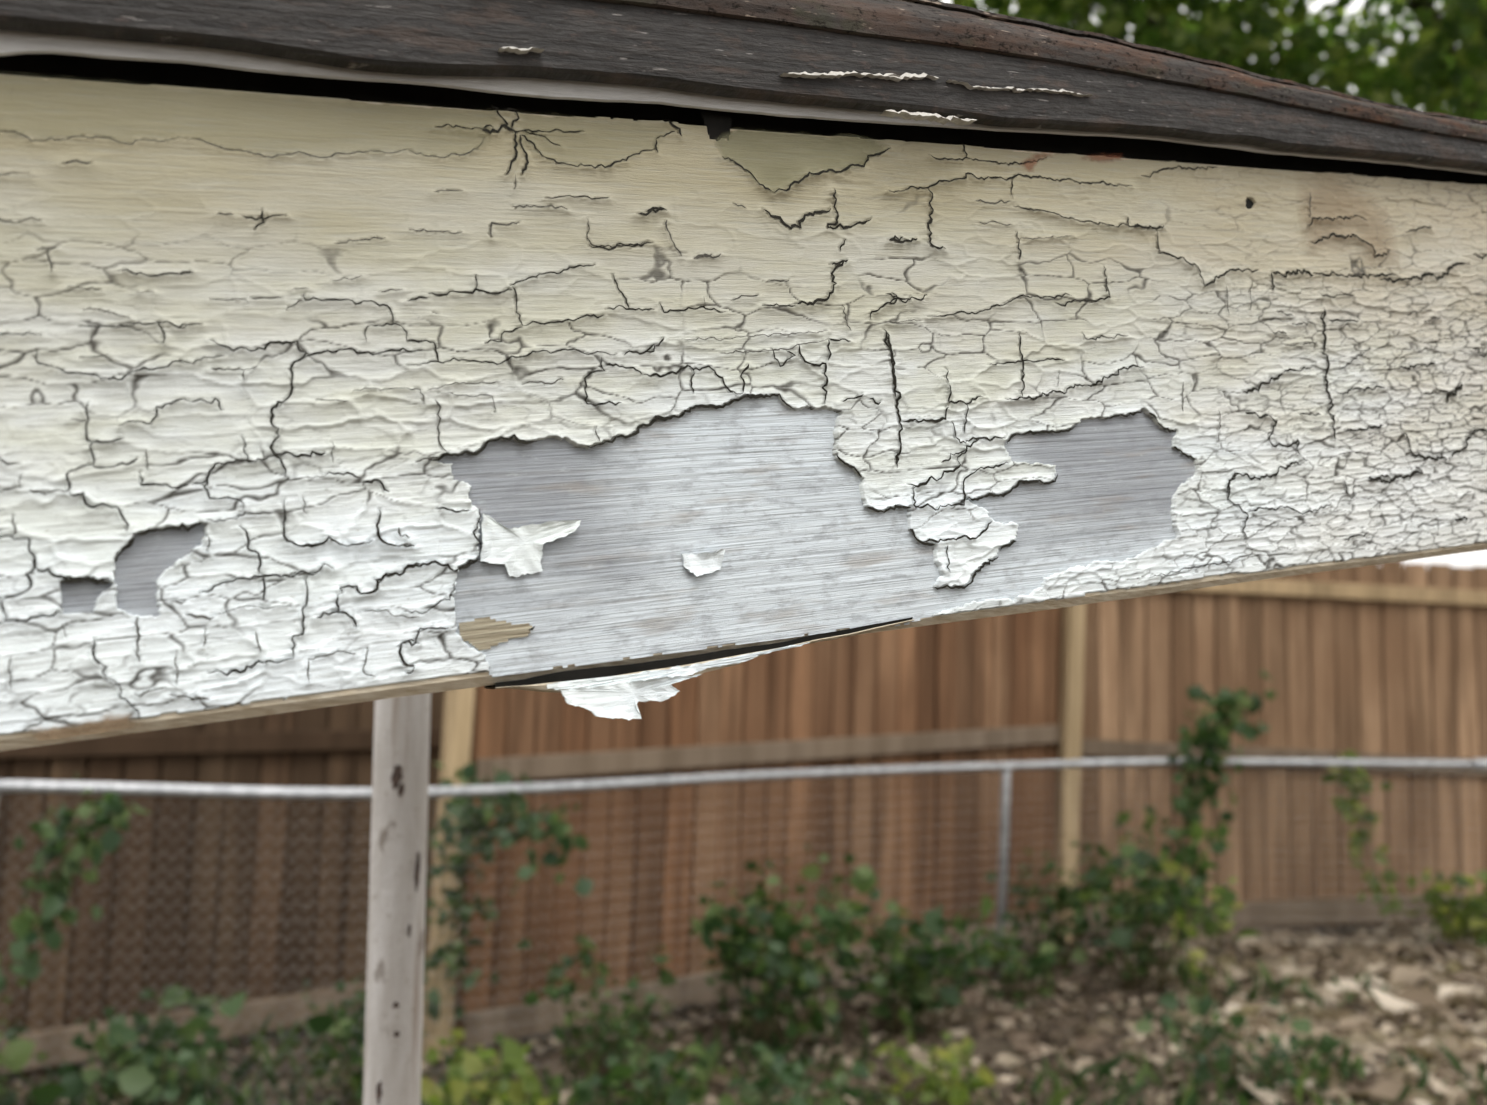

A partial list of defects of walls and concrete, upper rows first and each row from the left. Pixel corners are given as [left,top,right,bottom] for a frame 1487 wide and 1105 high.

peeling [61,522,205,617]
peeling [560,674,702,720]
crack [0,104,1487,719]
peeling [429,393,1195,677]